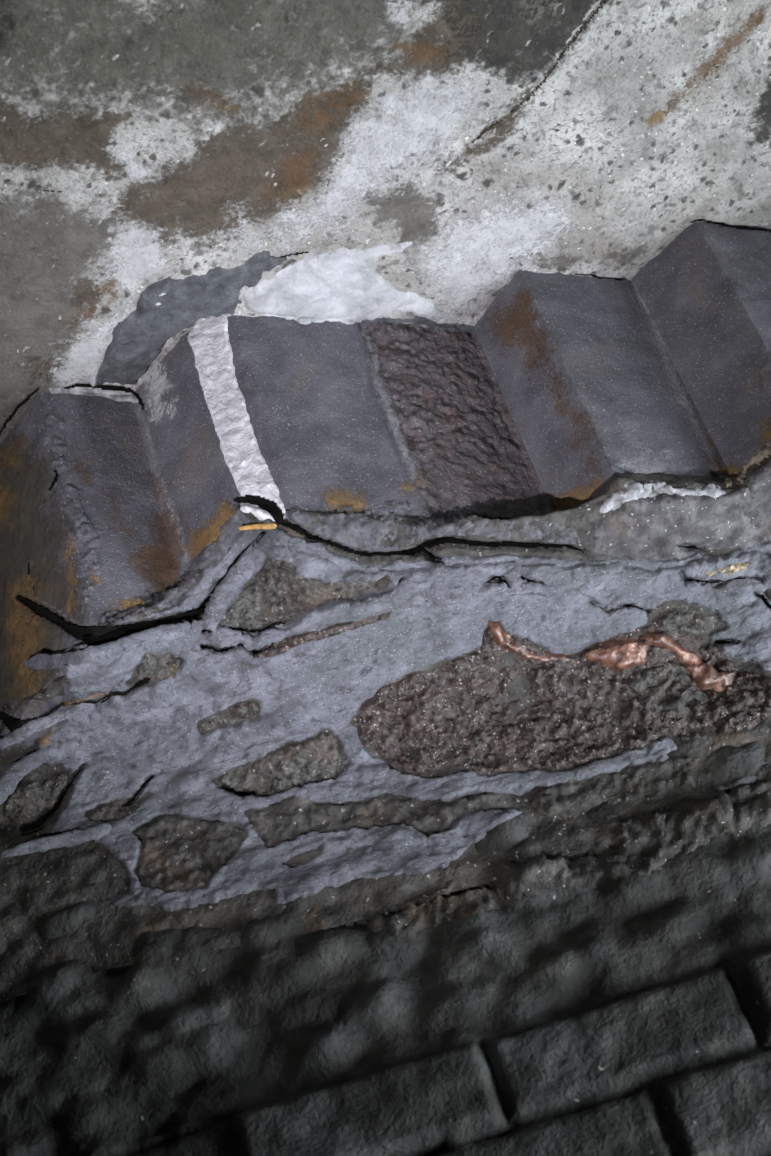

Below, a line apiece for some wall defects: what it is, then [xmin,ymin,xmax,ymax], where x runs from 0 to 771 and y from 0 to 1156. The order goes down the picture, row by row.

water stain [748,66,771,145]
water stain [0,0,647,387]
crack [0,383,143,434]
crack [14,495,586,656]
crack [678,546,771,607]
corrosion [3,575,48,703]
peeling [0,314,771,940]
crack [717,637,740,645]
crack [0,679,150,732]
crack [21,769,81,832]
crack [121,776,152,807]
crack [221,785,255,796]